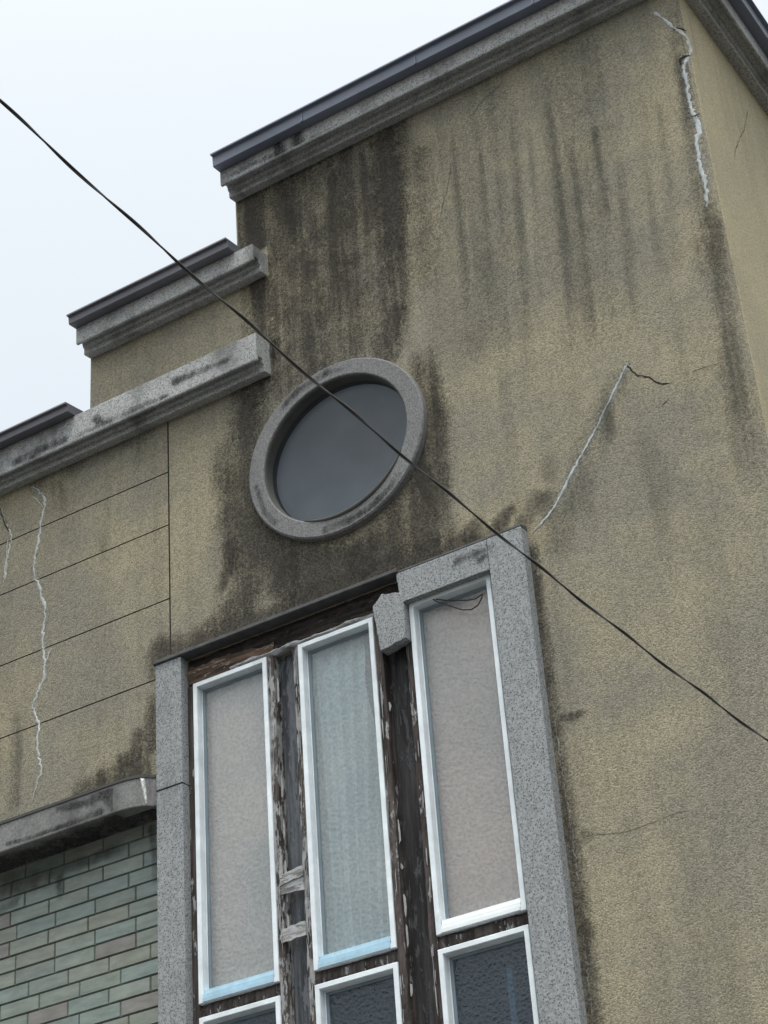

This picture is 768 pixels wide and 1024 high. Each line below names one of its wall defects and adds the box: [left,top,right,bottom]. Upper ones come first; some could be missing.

crack [654,12,709,207]
leakage [214,118,449,624]
crack [533,365,669,532]
leakage [493,505,522,530]
crack [0,486,52,800]
spalling [187,583,412,711]
peeling [269,678,283,798]
peeling [275,819,287,873]
peeling [395,863,409,947]